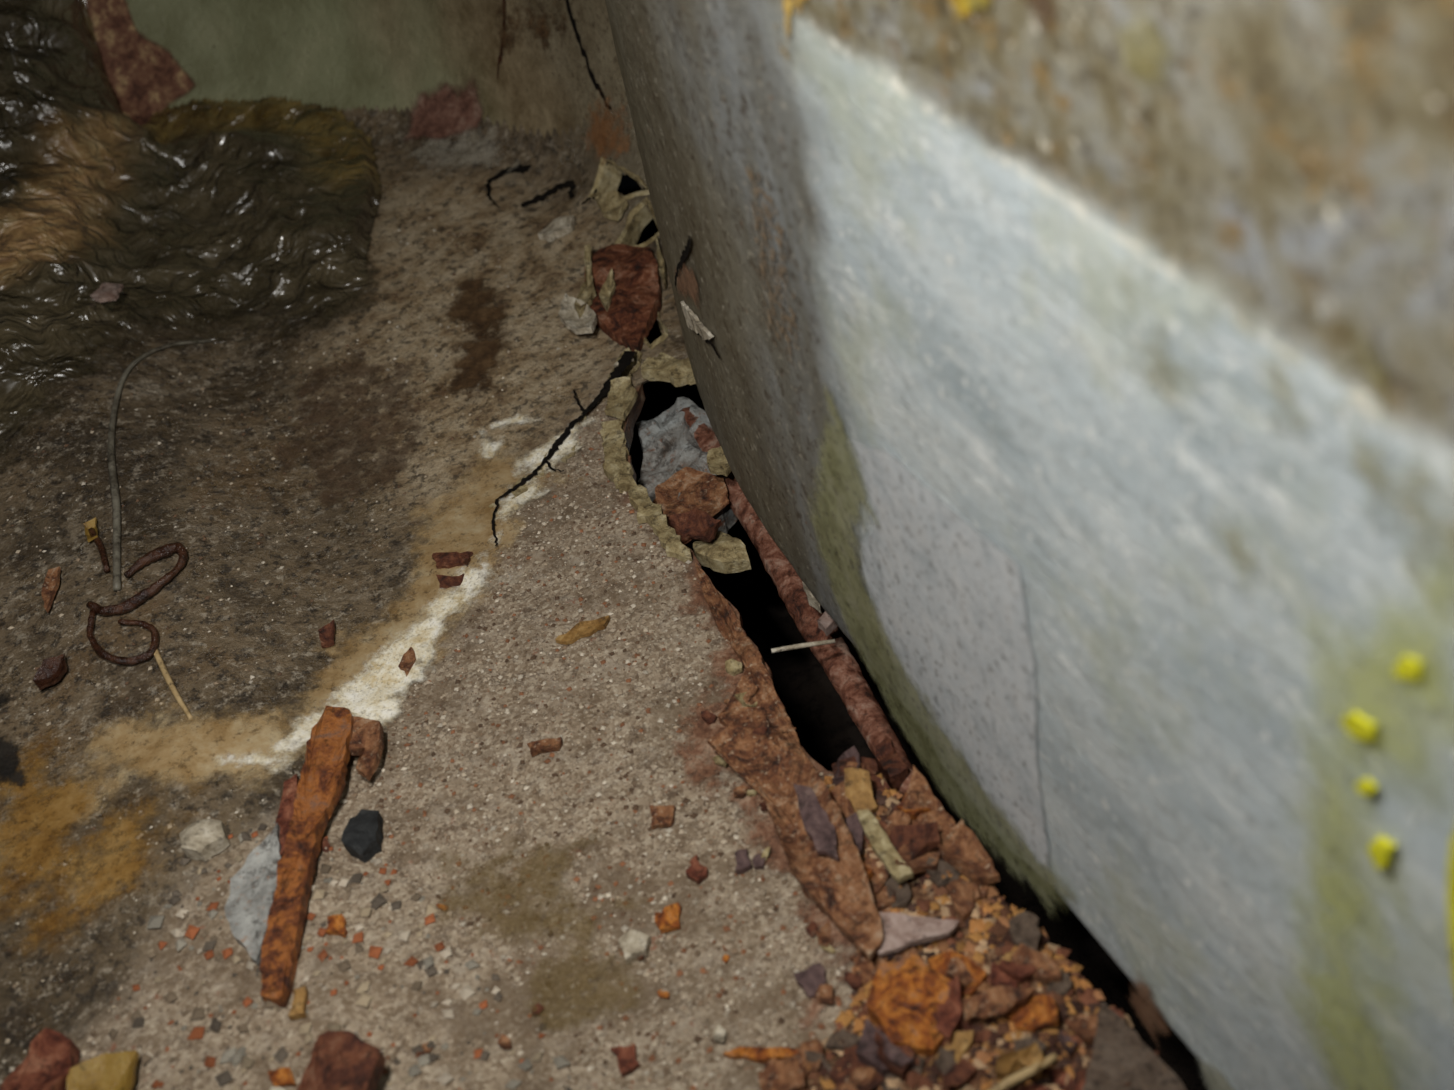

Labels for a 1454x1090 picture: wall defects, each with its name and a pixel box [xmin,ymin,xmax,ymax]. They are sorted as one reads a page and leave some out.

crack [497,0,506,79]
crack [566,0,611,111]
spalling [538,215,576,242]
spalling [559,156,696,562]
crack [675,235,720,359]
crack [488,350,637,546]
spalling [707,446,731,477]
corrosion [667,508,722,545]
leakage [0,415,594,942]
corrosion [259,705,384,1008]
corrosion [675,581,1169,1090]
corrosion [268,1067,297,1087]